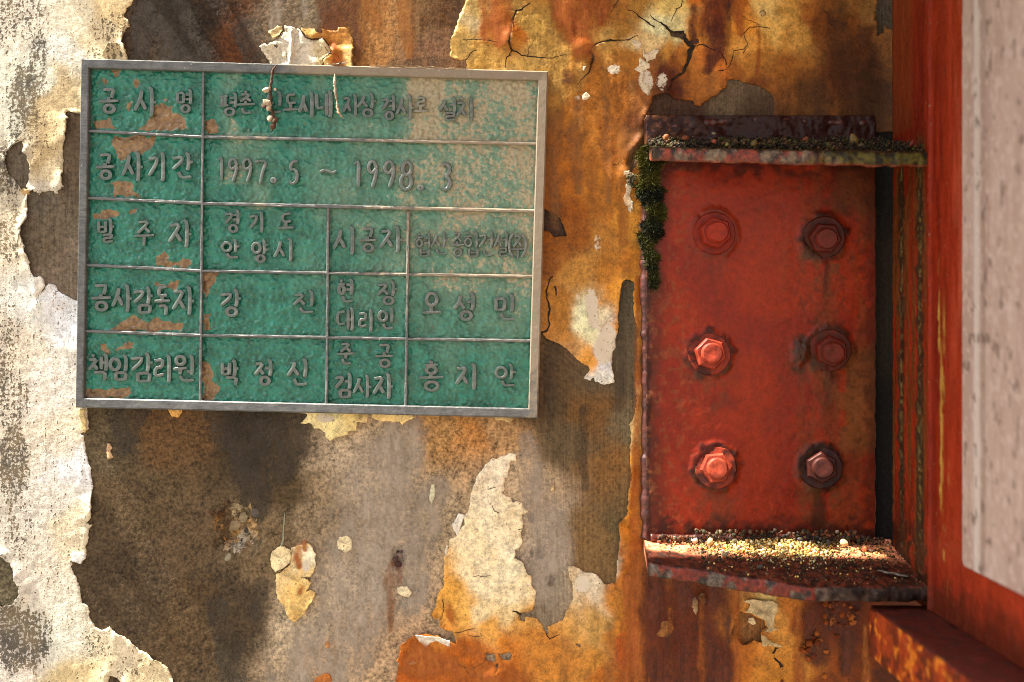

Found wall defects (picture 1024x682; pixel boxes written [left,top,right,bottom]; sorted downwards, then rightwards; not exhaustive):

peeling [259,25,354,66]
crack [463,0,768,91]
corrosion [689,0,743,74]
peeling [450,0,893,385]
peeling [0,0,173,682]
peeling [270,543,316,622]
leakage [266,416,449,682]
corrosion [402,638,528,682]
leakage [521,431,569,601]
peeling [395,388,921,682]
corrosion [621,276,741,682]
corrosion [780,601,870,682]